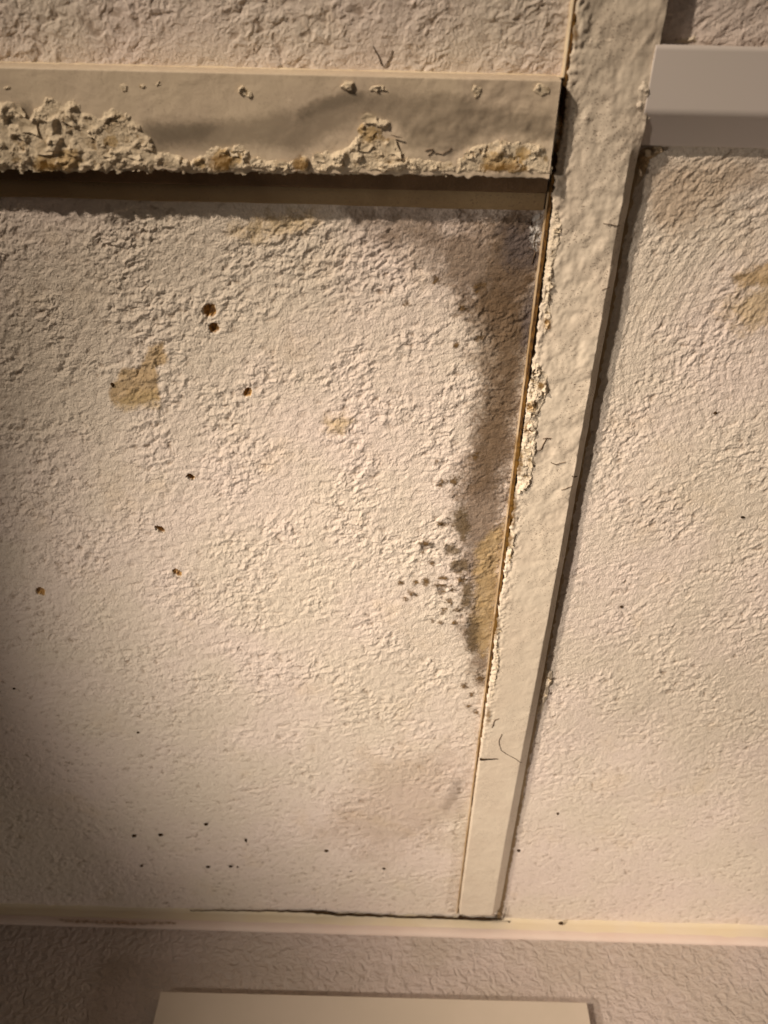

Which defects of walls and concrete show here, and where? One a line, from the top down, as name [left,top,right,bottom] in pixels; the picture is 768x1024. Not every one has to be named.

peeling [0,97,552,177]
damp [111,344,166,402]
crack [190,0,578,923]
damp [398,212,542,714]
flaking render [516,360,548,494]